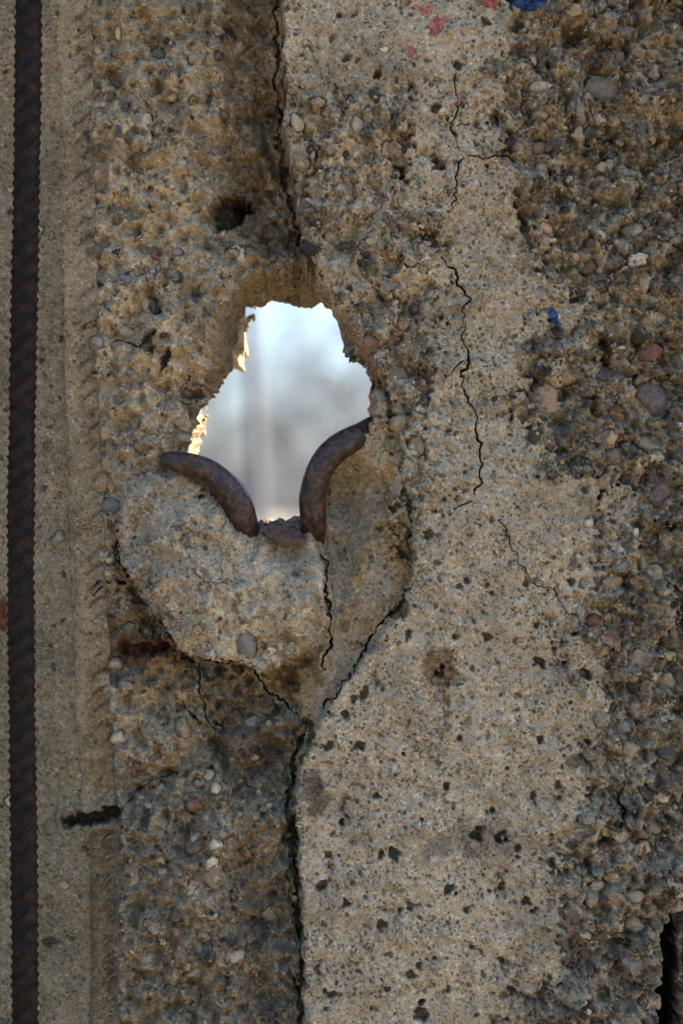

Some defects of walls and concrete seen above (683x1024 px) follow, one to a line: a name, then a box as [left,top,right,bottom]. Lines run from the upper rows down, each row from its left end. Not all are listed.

crack [269,0,306,247]
crack [446,74,516,213]
crack [441,257,486,510]
spalling [57,0,453,1024]
crack [92,534,411,1024]